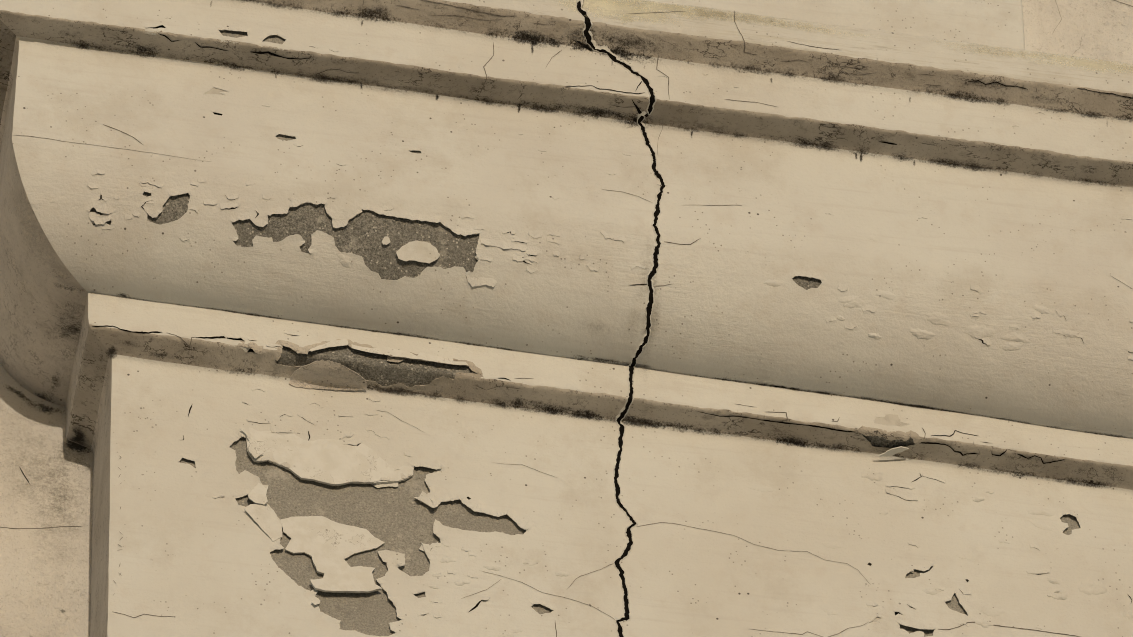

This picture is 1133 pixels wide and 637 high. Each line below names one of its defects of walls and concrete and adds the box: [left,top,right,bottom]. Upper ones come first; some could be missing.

crack [396,0,546,95]
water stain [514,30,594,52]
water stain [603,39,653,60]
water stain [581,107,638,126]
peeling [81,169,119,235]
peeling [132,178,560,289]
peeling [785,269,849,297]
crack [461,0,870,637]
peeling [212,331,535,637]
peeling [1053,509,1087,541]
peeling [866,578,975,637]
crack [938,622,1080,637]